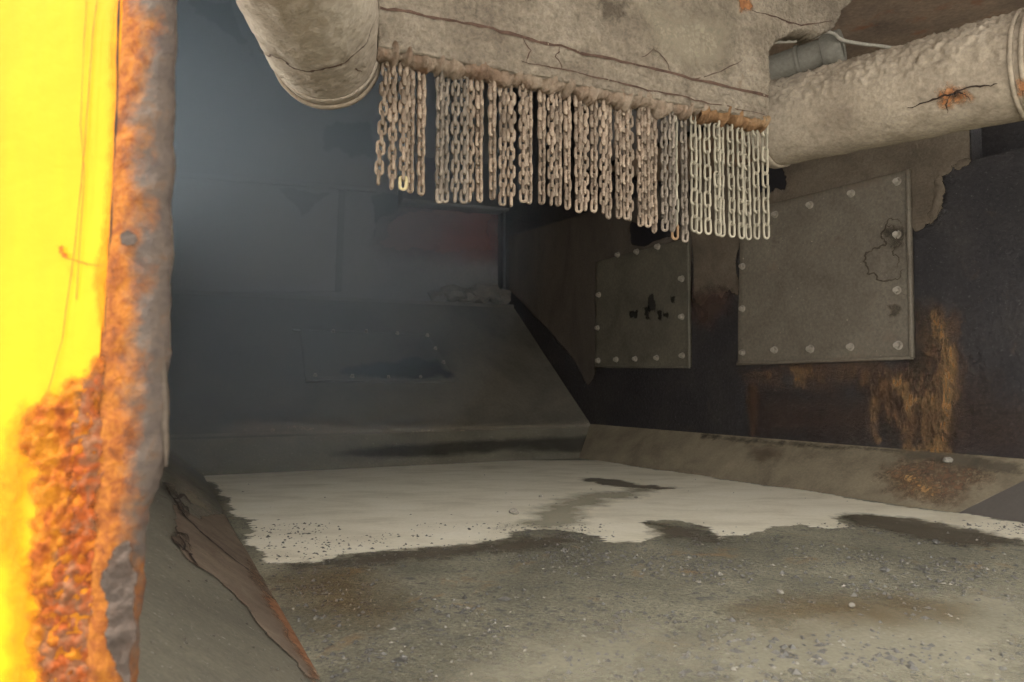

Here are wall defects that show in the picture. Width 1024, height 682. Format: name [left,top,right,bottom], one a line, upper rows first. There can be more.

crack [261,6,769,116]
crack [907,83,997,113]
corrosion [95,0,123,325]
corrosion [871,307,963,453]
corrosion [0,356,106,682]
crack [161,484,261,579]
damp [328,478,673,567]
damp [844,514,1013,546]